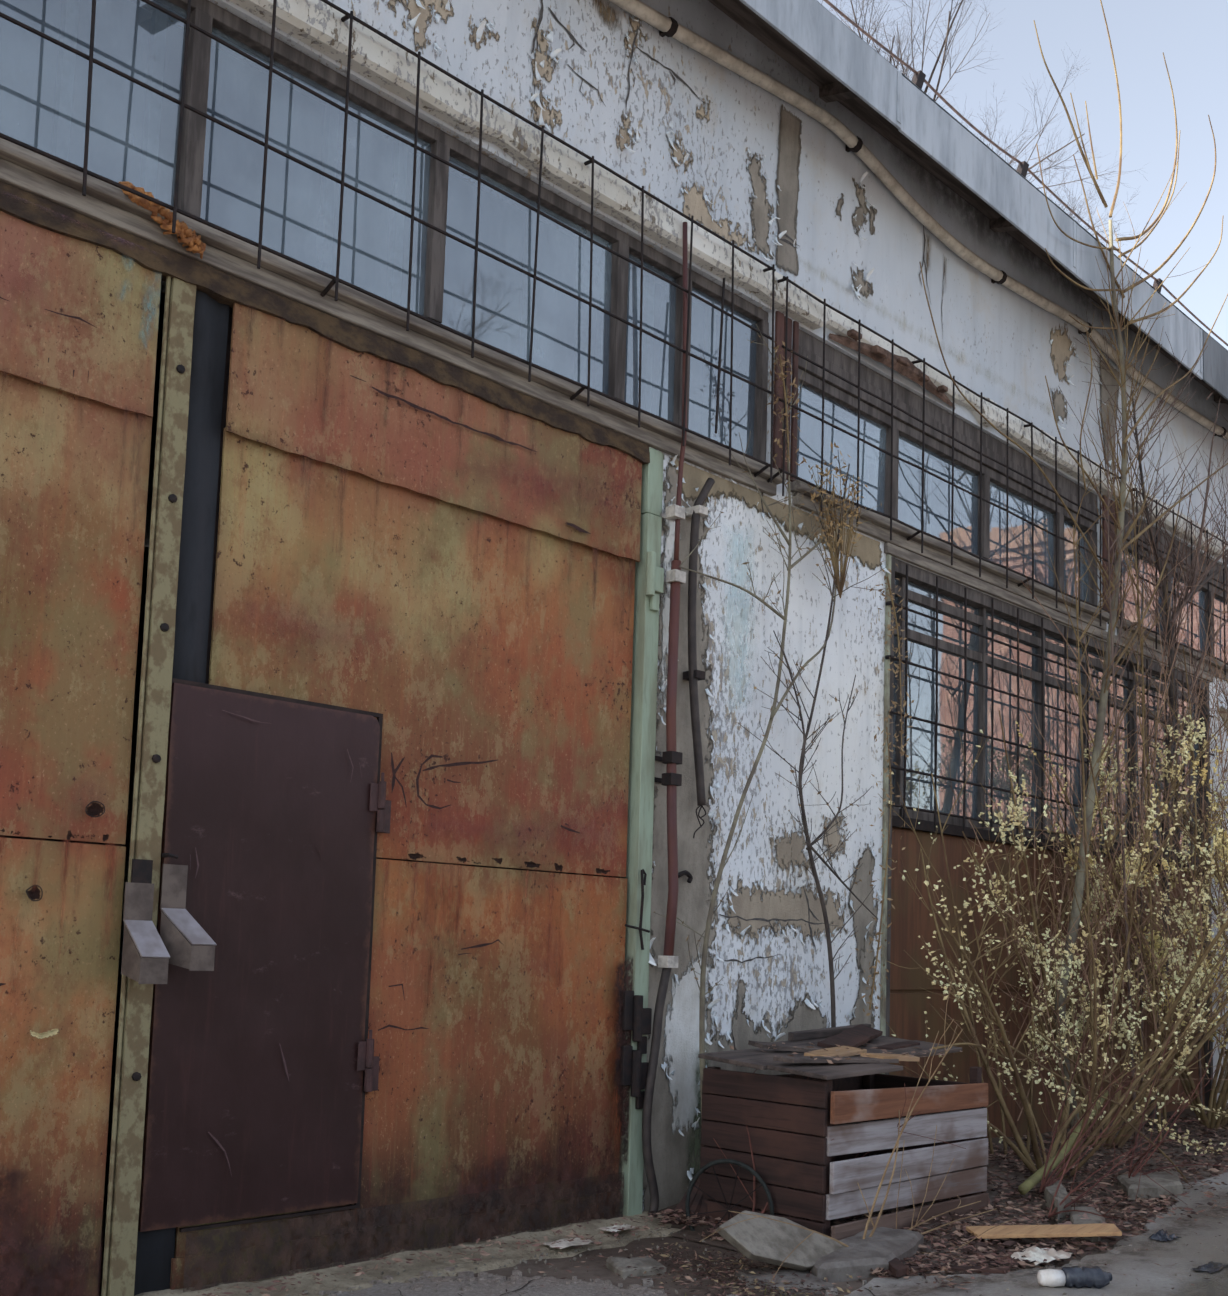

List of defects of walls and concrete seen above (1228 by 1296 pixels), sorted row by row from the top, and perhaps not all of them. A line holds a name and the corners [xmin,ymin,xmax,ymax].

peeling [384,0,454,53]
peeling [469,18,500,52]
peeling [622,14,648,66]
peeling [530,17,562,134]
peeling [616,111,641,156]
peeling [696,92,713,123]
peeling [666,121,796,261]
peeling [833,171,877,240]
peeling [851,261,874,300]
peeling [1050,322,1083,430]
peeling [642,455,891,1211]
corrosion [614,957,633,1161]